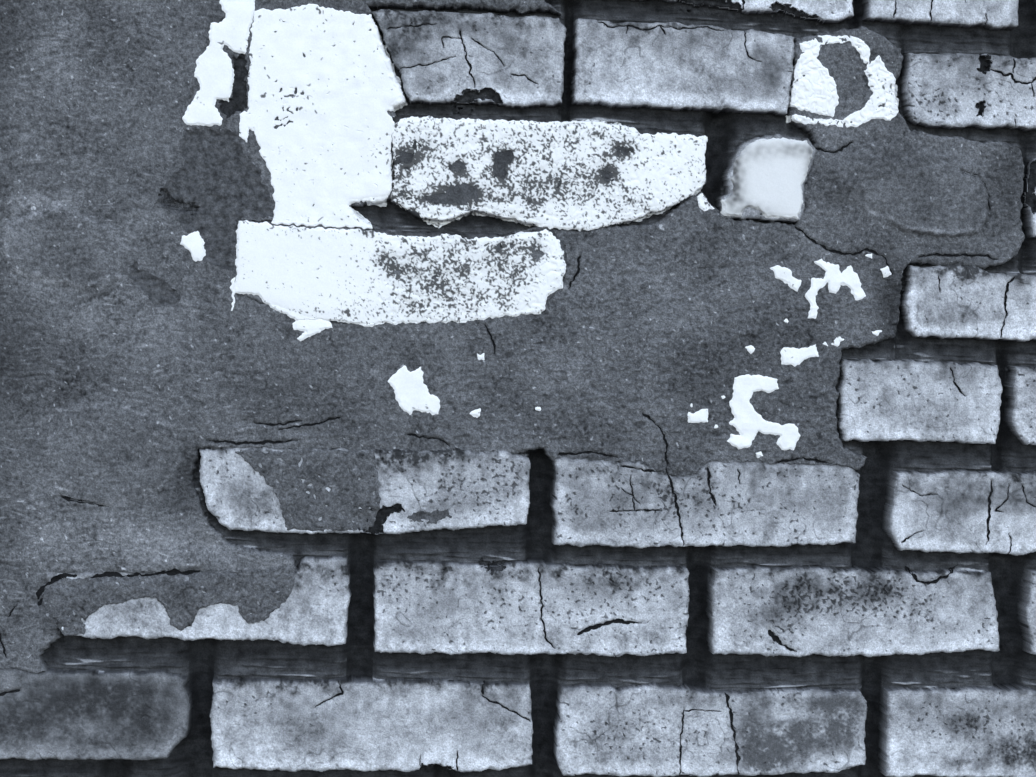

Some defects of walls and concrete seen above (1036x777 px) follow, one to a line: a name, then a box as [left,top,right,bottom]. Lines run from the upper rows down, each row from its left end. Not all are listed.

crack [387,24,537,84]
peeling [769,1,899,127]
peeling [154,0,813,341]
peeling [770,259,866,319]
peeling [780,336,844,367]
peeling [388,365,440,415]
peeling [687,374,800,458]
crack [558,413,684,546]
crack [776,456,828,464]
spalling [358,503,452,535]
crack [986,480,1036,553]
crack [679,692,741,775]